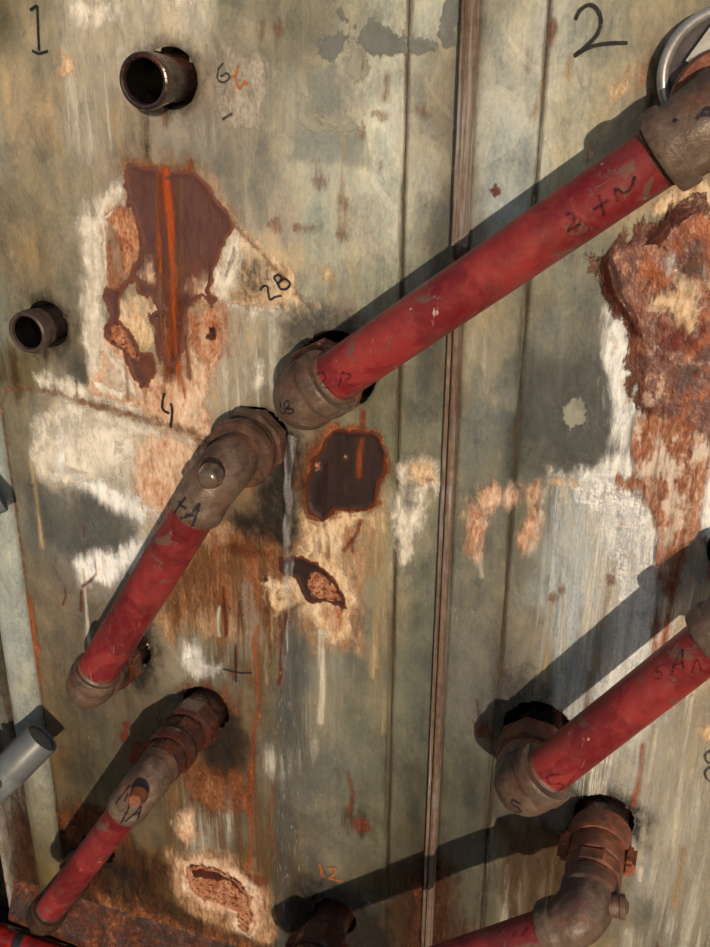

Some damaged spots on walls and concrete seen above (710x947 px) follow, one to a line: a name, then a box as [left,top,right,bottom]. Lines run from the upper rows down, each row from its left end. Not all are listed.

peeling [317,0,461,82]
efflorescence [30,373,205,548]
rust [77,158,243,447]
rust [157,415,396,690]
peeling [463,466,553,576]
leakage [541,465,710,718]
rust [557,180,710,653]
leakage [498,821,565,921]
leakage [579,754,613,796]
leakage [633,692,710,947]